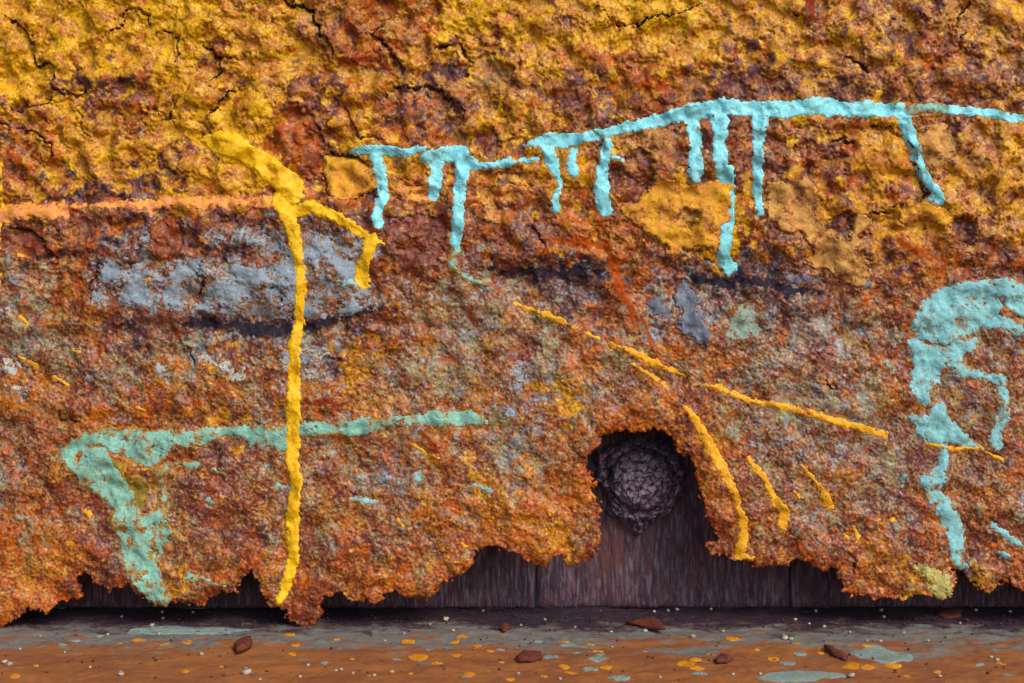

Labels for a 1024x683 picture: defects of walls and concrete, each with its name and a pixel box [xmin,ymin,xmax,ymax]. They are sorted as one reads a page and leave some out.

crack [0,14,92,166]
crack [147,98,176,121]
crack [109,7,242,113]
crack [284,0,334,59]
corrosion [297,213,364,265]
corrosion [548,234,595,250]
corrosion [606,252,653,343]
peeling [718,298,763,346]
corrosion [998,296,1024,328]
peeling [497,352,534,420]
peeling [898,276,1024,600]
peeling [60,384,490,607]